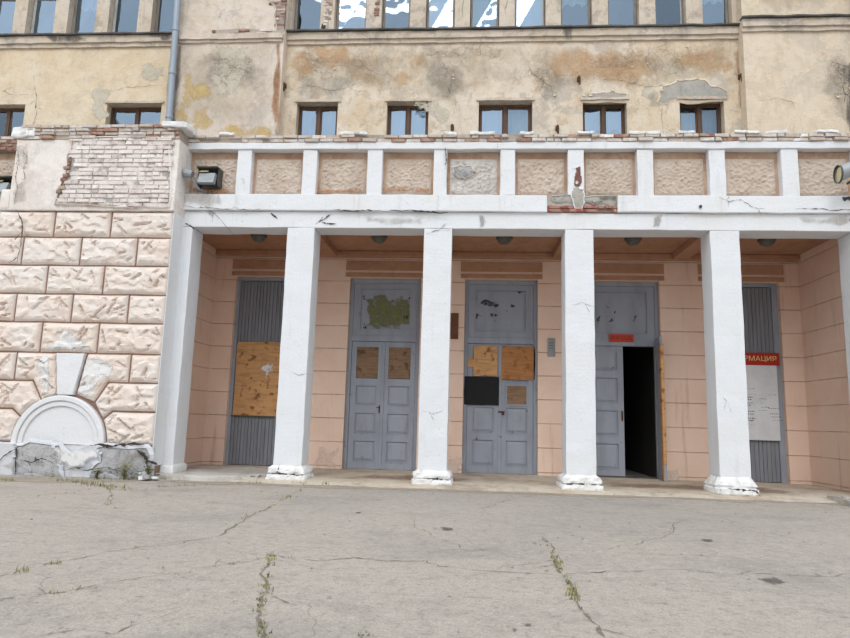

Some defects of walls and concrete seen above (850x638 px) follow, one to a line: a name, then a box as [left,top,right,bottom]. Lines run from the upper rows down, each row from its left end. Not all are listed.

flaking render [212,0,289,34]
peeling [211,45,253,98]
flaking render [582,89,629,103]
flaking render [601,45,729,106]
flaking render [54,136,174,210]
flaking render [547,166,617,213]
crack [0,442,157,474]